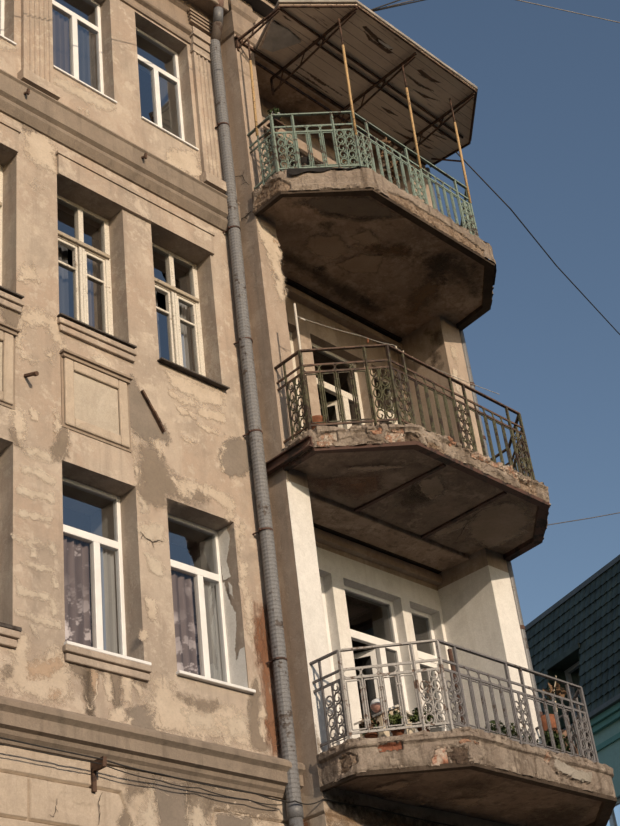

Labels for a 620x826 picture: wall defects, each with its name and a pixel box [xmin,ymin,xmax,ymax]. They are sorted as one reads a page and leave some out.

peeling [252,179,290,302]
spalling [386,190,484,256]
leakage [281,254,379,312]
spalling [314,432,339,448]
spalling [366,428,459,454]
spalling [468,449,538,497]
peeling [434,501,534,549]
peeling [125,370,270,751]
corrosion [254,606,281,754]
spalling [378,742,402,752]
spalling [431,739,479,766]